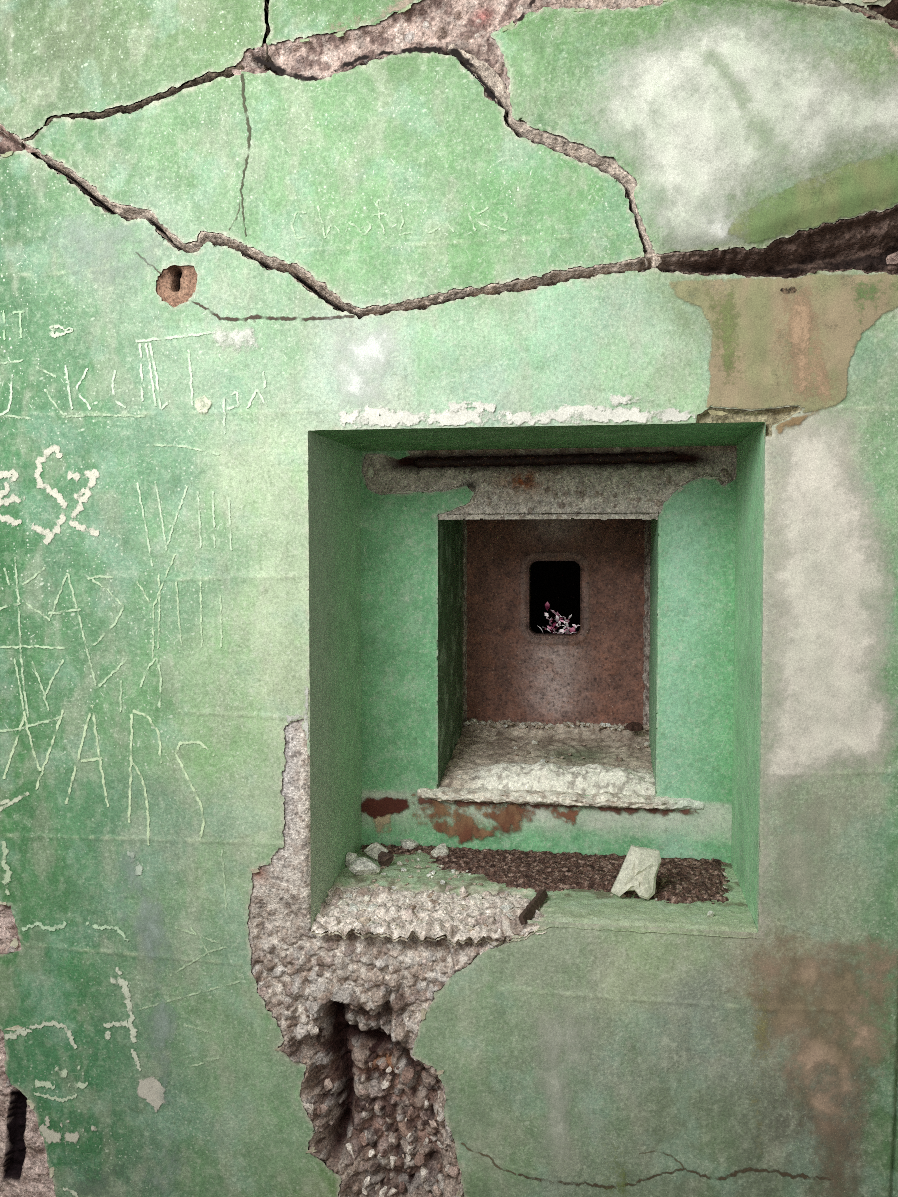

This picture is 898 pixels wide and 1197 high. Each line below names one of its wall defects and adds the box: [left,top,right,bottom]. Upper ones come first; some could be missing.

spalling [232,0,675,113]
crack [0,0,898,341]
leakage [595,10,898,249]
peeling [338,394,802,440]
spalling [361,446,737,520]
leakage [669,273,898,792]
corrosion [361,794,579,845]
corrosion [598,807,697,816]
spalling [247,678,545,1197]
leakage [650,1017,690,1073]
spalling [0,1020,97,1197]
crack [461,1143,831,1190]